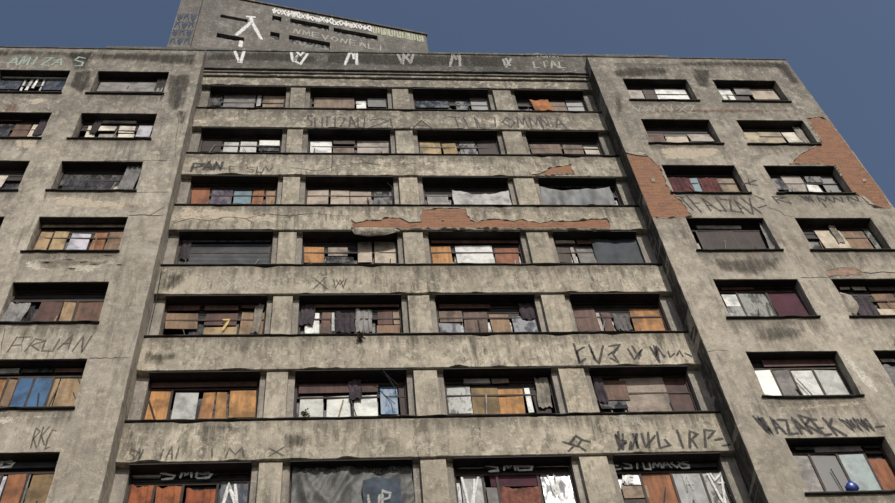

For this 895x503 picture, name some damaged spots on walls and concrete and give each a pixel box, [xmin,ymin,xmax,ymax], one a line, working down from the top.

spalling [349,207,612,230]
spalling [532,163,575,176]
spalling [626,147,719,219]
spalling [789,116,892,209]